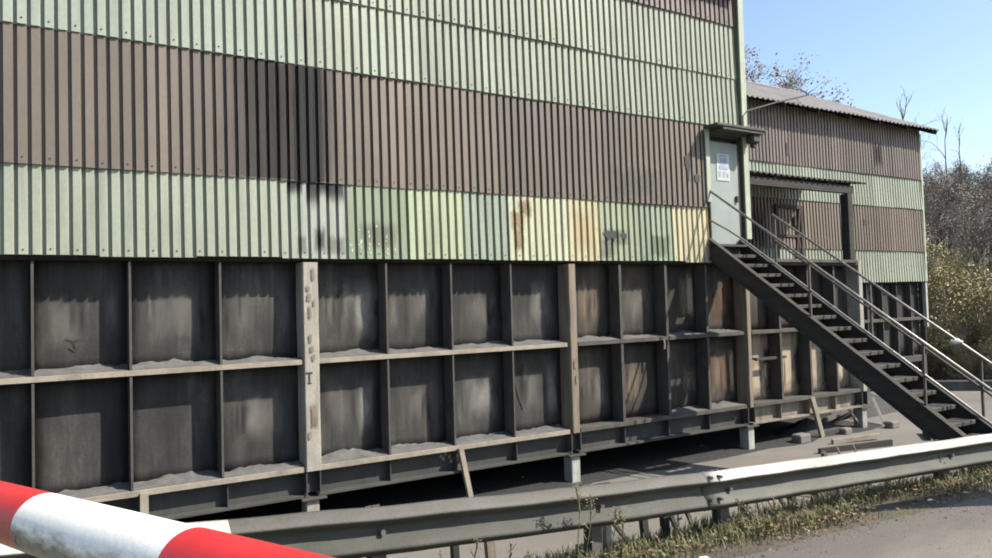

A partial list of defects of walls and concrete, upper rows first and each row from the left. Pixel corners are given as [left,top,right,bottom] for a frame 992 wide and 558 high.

water stain [273,64,343,199]
rust [513,202,530,247]
rust [711,352,734,389]